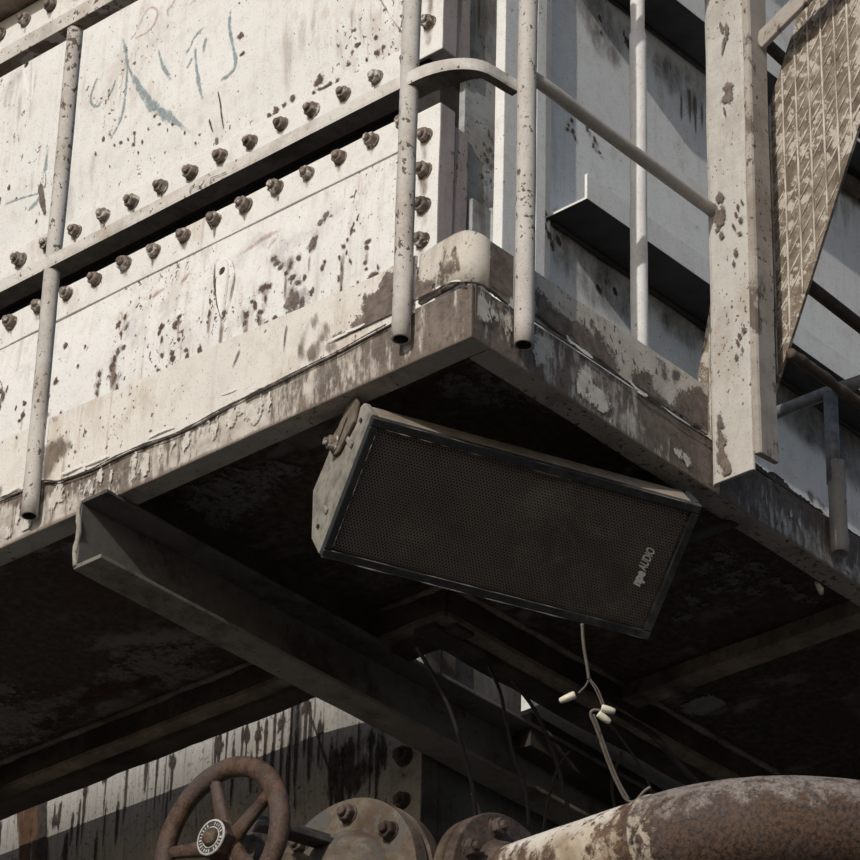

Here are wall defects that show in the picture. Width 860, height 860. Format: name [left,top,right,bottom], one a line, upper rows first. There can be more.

corrosion [712,191,743,239]
corrosion [157,314,202,361]
corrosion [206,262,235,343]
peeling [333,271,393,339]
peeling [477,241,514,341]
peeling [47,391,272,512]
peeling [631,357,731,476]
corrosion [16,802,48,860]
damp [51,787,88,860]
damp [94,770,128,860]
damp [143,753,176,814]
damp [214,698,350,809]